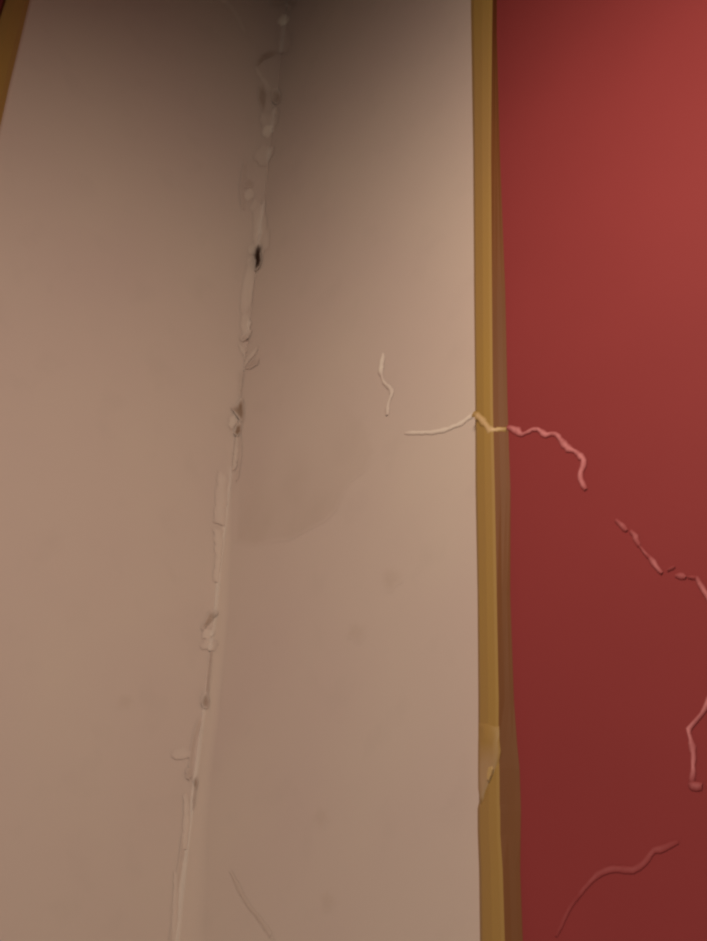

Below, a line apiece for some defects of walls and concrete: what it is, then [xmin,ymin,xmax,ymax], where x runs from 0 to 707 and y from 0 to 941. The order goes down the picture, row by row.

crack [212,0,296,582]
crack [378,353,394,415]
crack [404,411,587,491]
crack [614,518,707,601]
crack [169,609,219,941]
peeling [478,723,501,805]
crack [685,696,707,791]
crack [555,840,679,936]